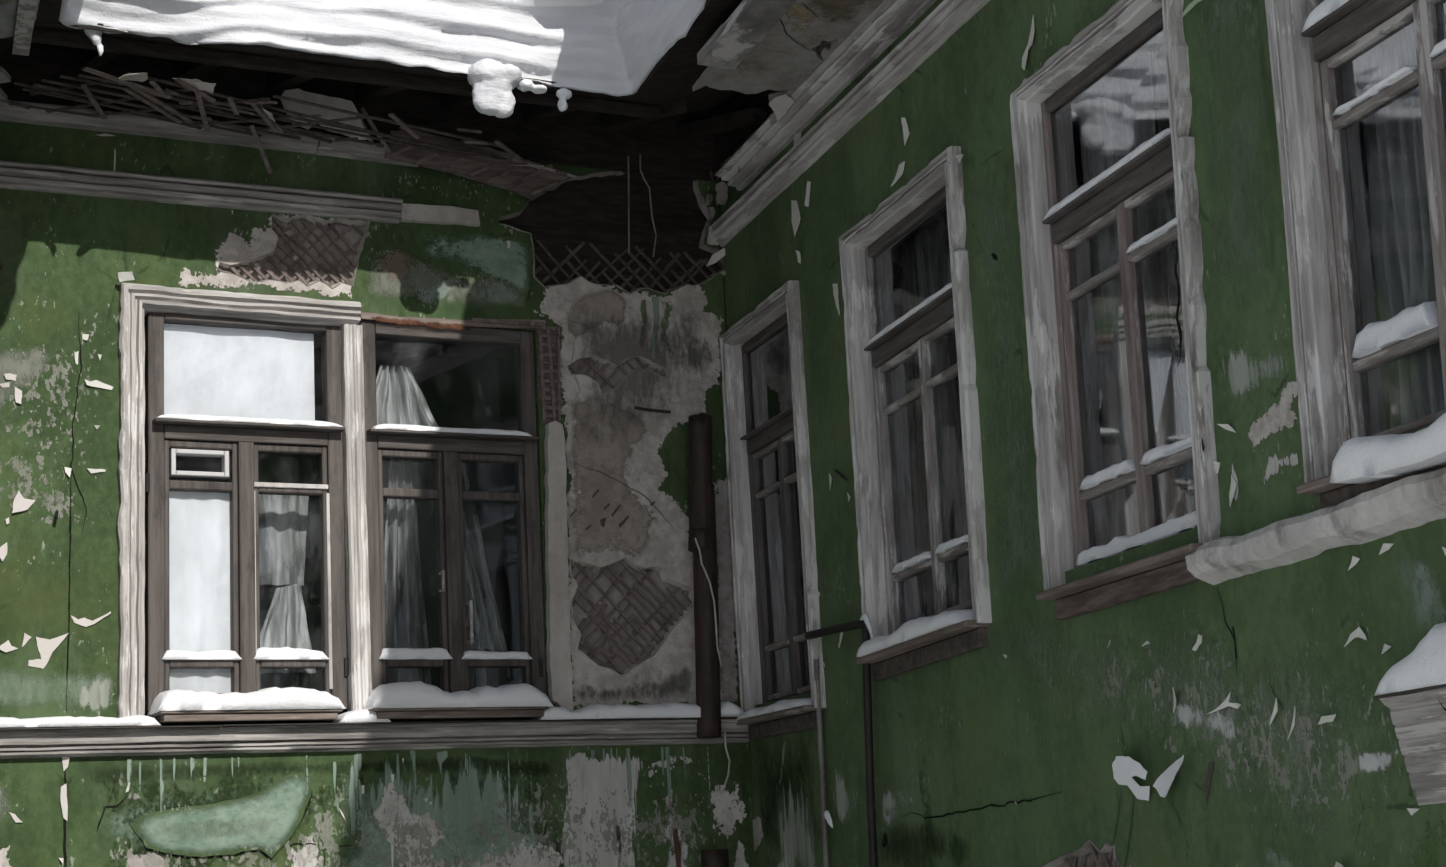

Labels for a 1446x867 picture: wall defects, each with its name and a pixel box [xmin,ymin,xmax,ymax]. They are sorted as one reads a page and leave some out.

spalling [178,214,369,298]
spalling [704,155,740,275]
spalling [533,277,724,709]
peeling [114,752,763,867]
peeling [778,786,815,867]
crack [903,791,1063,819]